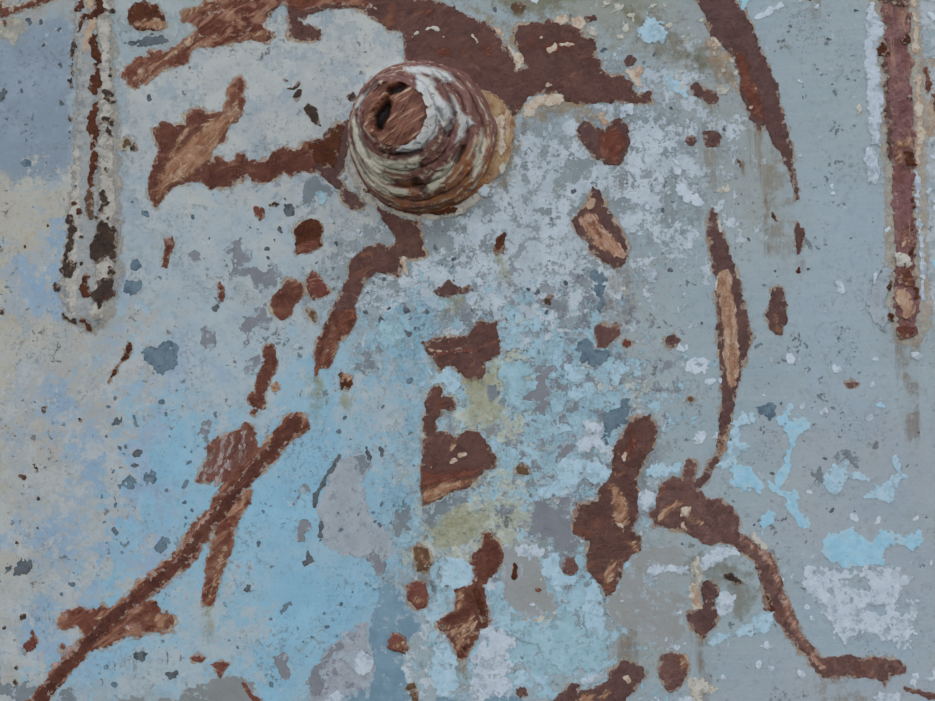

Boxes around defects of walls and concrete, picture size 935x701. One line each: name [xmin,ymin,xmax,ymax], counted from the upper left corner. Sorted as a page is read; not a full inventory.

rust [53,0,654,309]
rust [696,0,800,201]
rust [269,206,429,377]
peeling [293,446,475,701]
rust [419,320,500,507]
rust [434,531,518,661]
peeling [427,338,740,701]
rust [561,207,907,693]
peeling [708,611,774,650]
peeling [692,402,811,529]
peeling [811,449,909,504]
peeling [802,527,924,650]